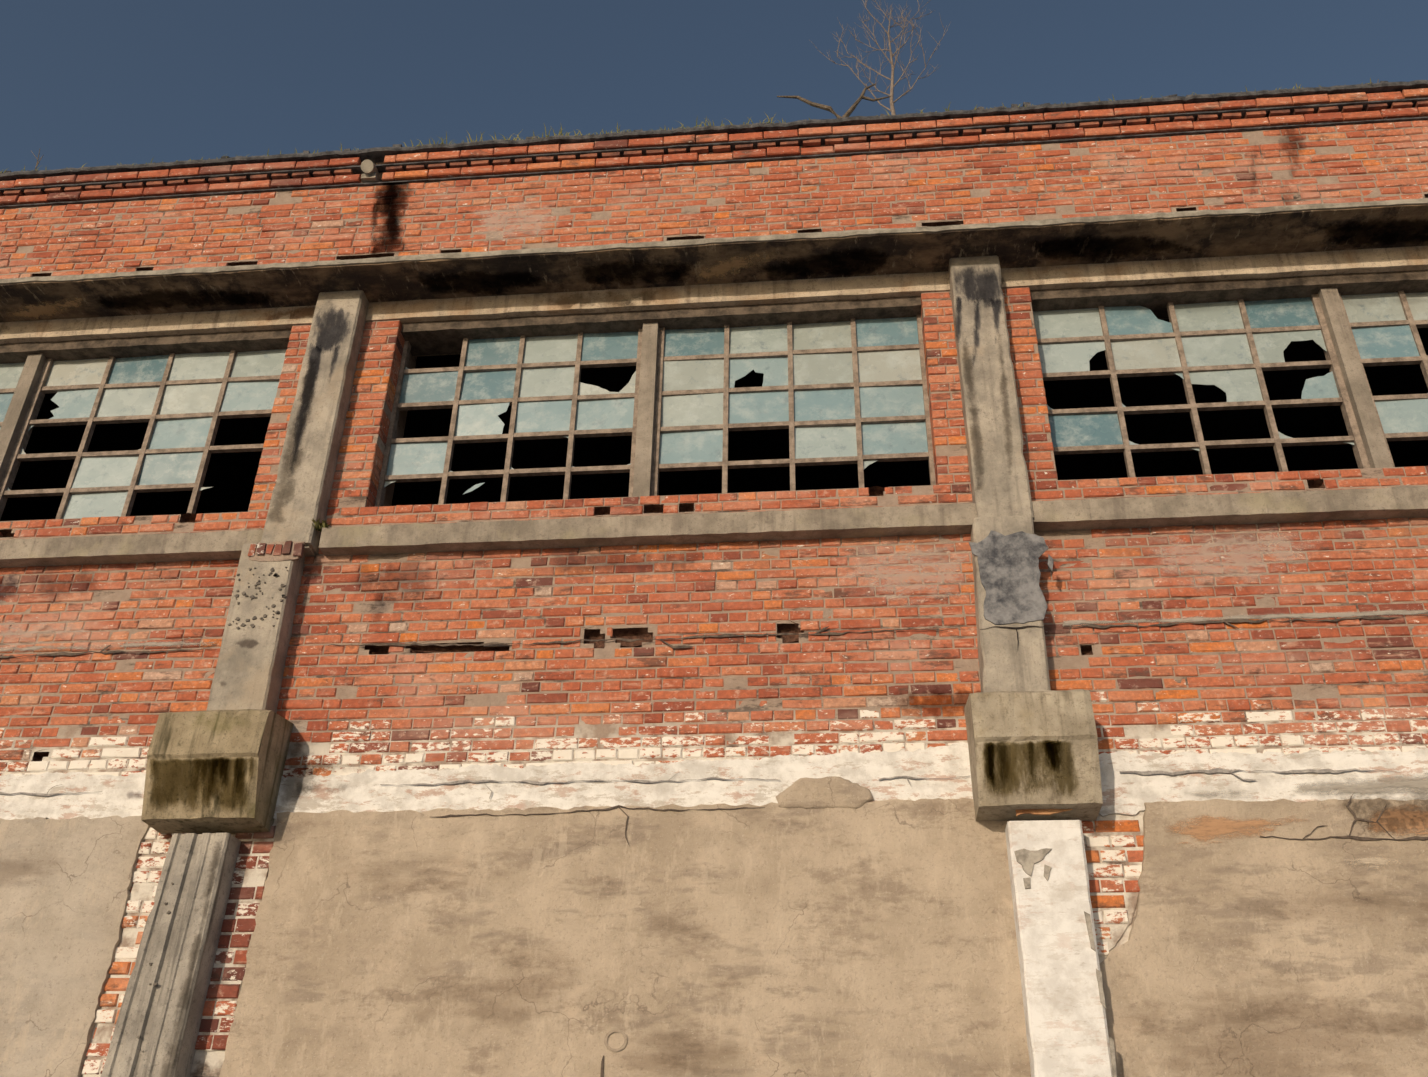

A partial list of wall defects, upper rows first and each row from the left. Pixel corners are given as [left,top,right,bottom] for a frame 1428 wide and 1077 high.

leakage [372,178,408,253]
leakage [956,298,1001,345]
leakage [294,346,338,457]
spalling [364,643,389,655]
spalling [406,641,513,653]
crack [380,772,778,844]
crack [1120,768,1428,841]
peeling [1014,848,1051,889]
spalling [81,827,186,1077]
spalling [195,825,277,1051]
spalling [1081,819,1144,1009]
peeling [1109,1037,1117,1077]